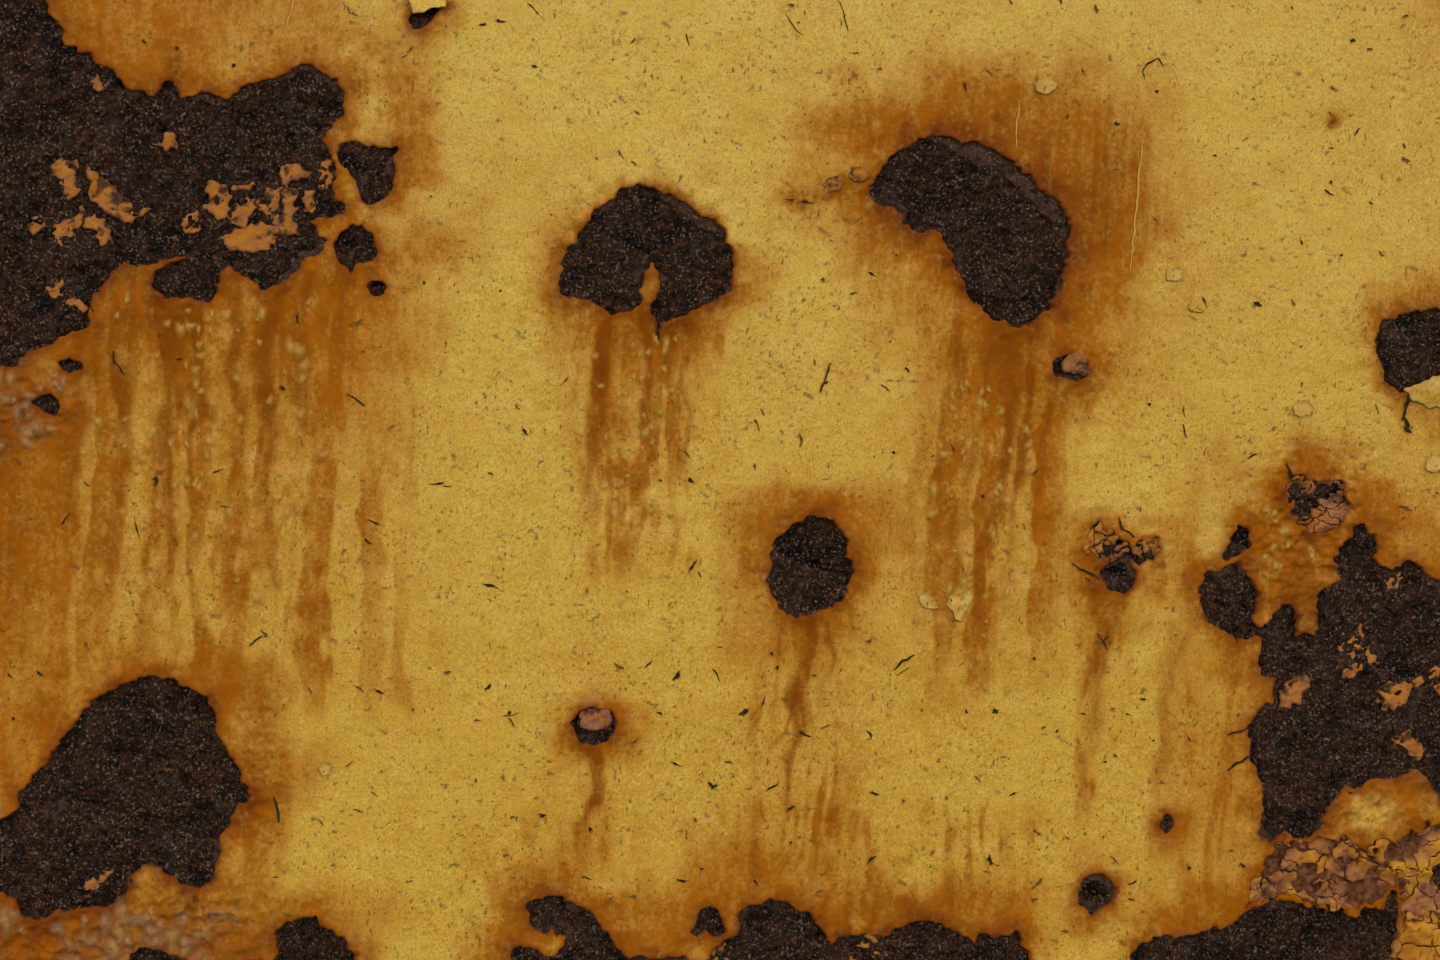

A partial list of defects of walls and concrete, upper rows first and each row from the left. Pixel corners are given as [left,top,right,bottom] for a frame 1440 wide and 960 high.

peeling [0,677,249,920]
peeling [0,0,398,367]
rust [0,0,442,960]
peeling [559,185,734,322]
rust [542,182,751,558]
peeling [766,516,854,618]
peeling [691,899,1029,960]
peeling [823,136,1071,327]
rust [787,66,1166,650]
rust [1068,441,1440,960]
peeling [1130,474,1440,960]
rust [1370,290,1440,407]